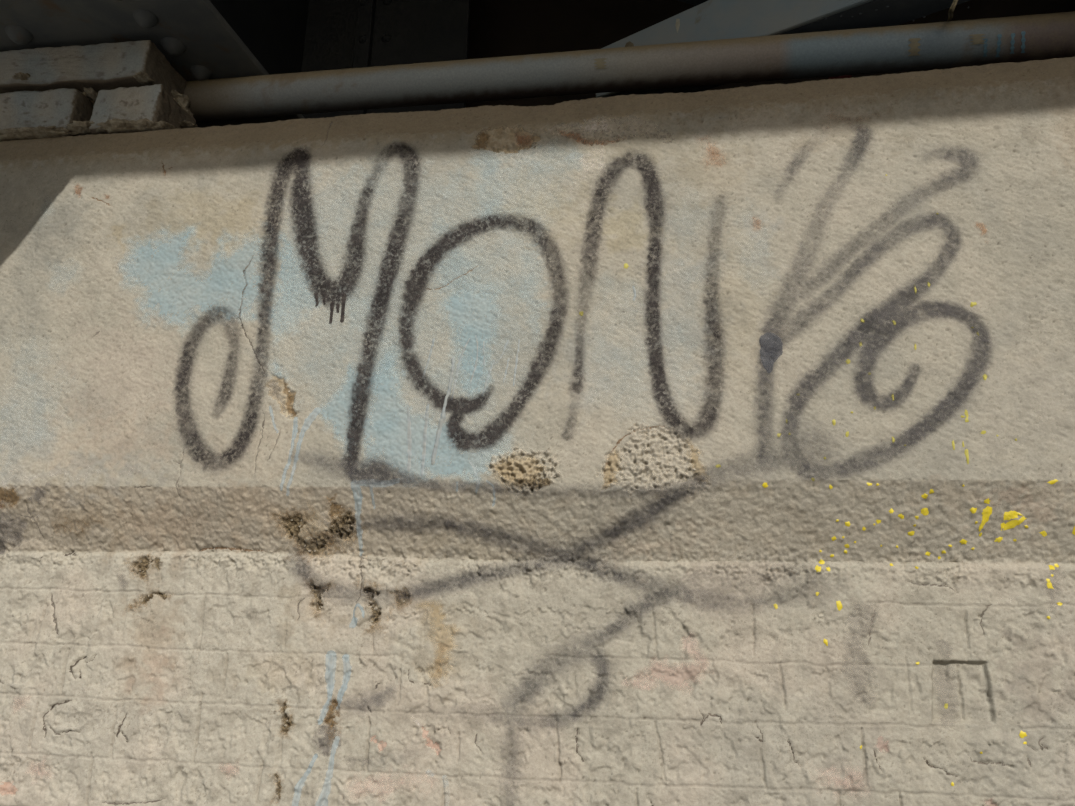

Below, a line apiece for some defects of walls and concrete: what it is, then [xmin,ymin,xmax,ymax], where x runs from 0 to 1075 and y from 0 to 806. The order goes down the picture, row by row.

spalling [472,126,541,154]
crack [236,256,267,377]
spalling [267,376,296,419]